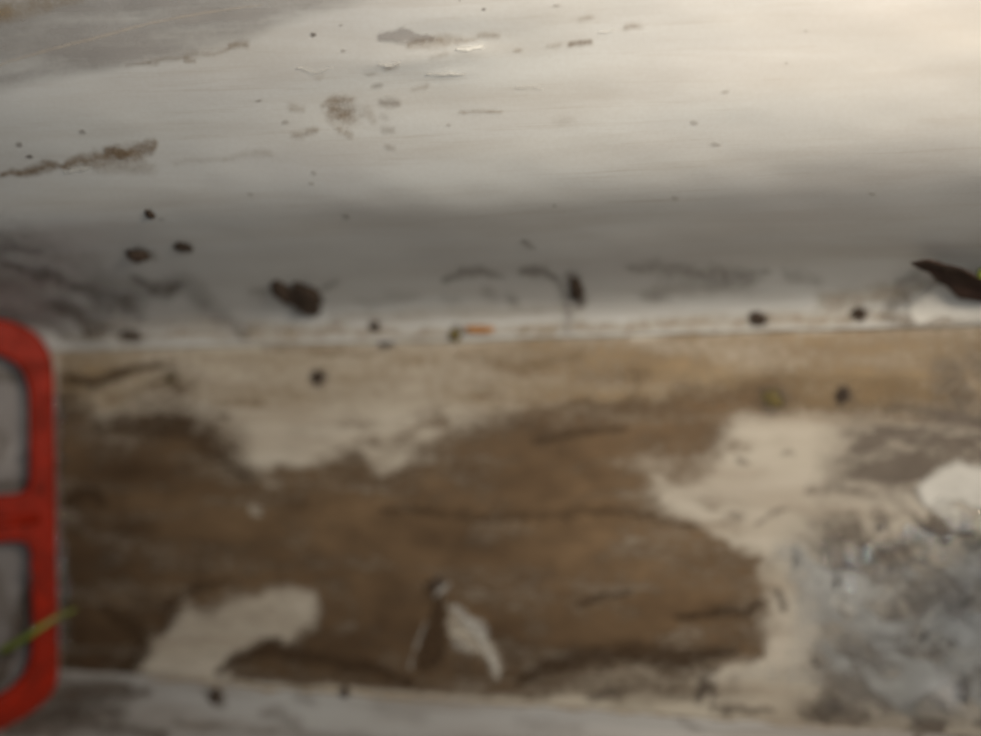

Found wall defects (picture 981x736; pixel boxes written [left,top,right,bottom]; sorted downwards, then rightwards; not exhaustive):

leakage [918,463,981,530]
leakage [794,548,981,712]